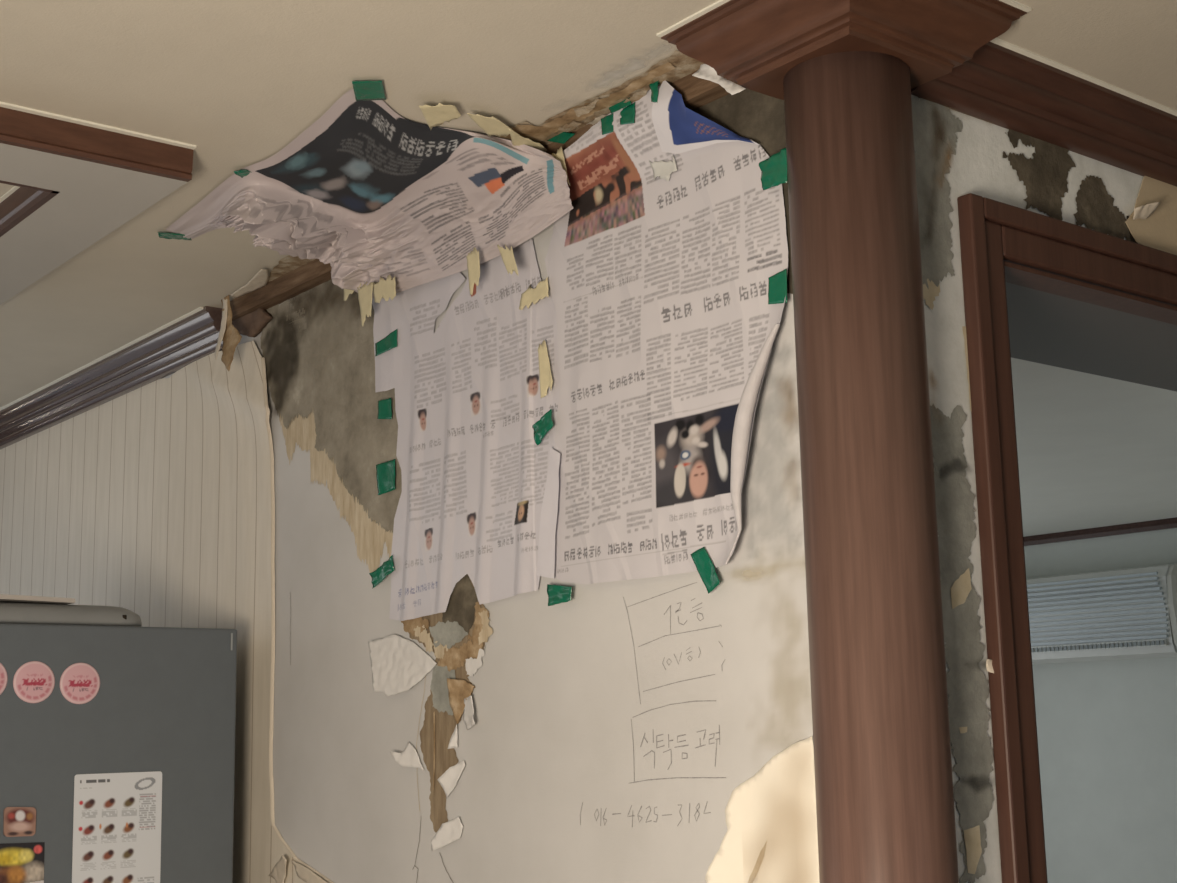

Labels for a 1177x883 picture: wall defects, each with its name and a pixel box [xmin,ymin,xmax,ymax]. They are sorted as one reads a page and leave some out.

spalling [911,95,962,310]
spalling [1003,129,1135,243]
spalling [260,279,402,573]
spalling [430,664,455,716]
spalling [442,574,478,633]
spalling [930,404,994,883]